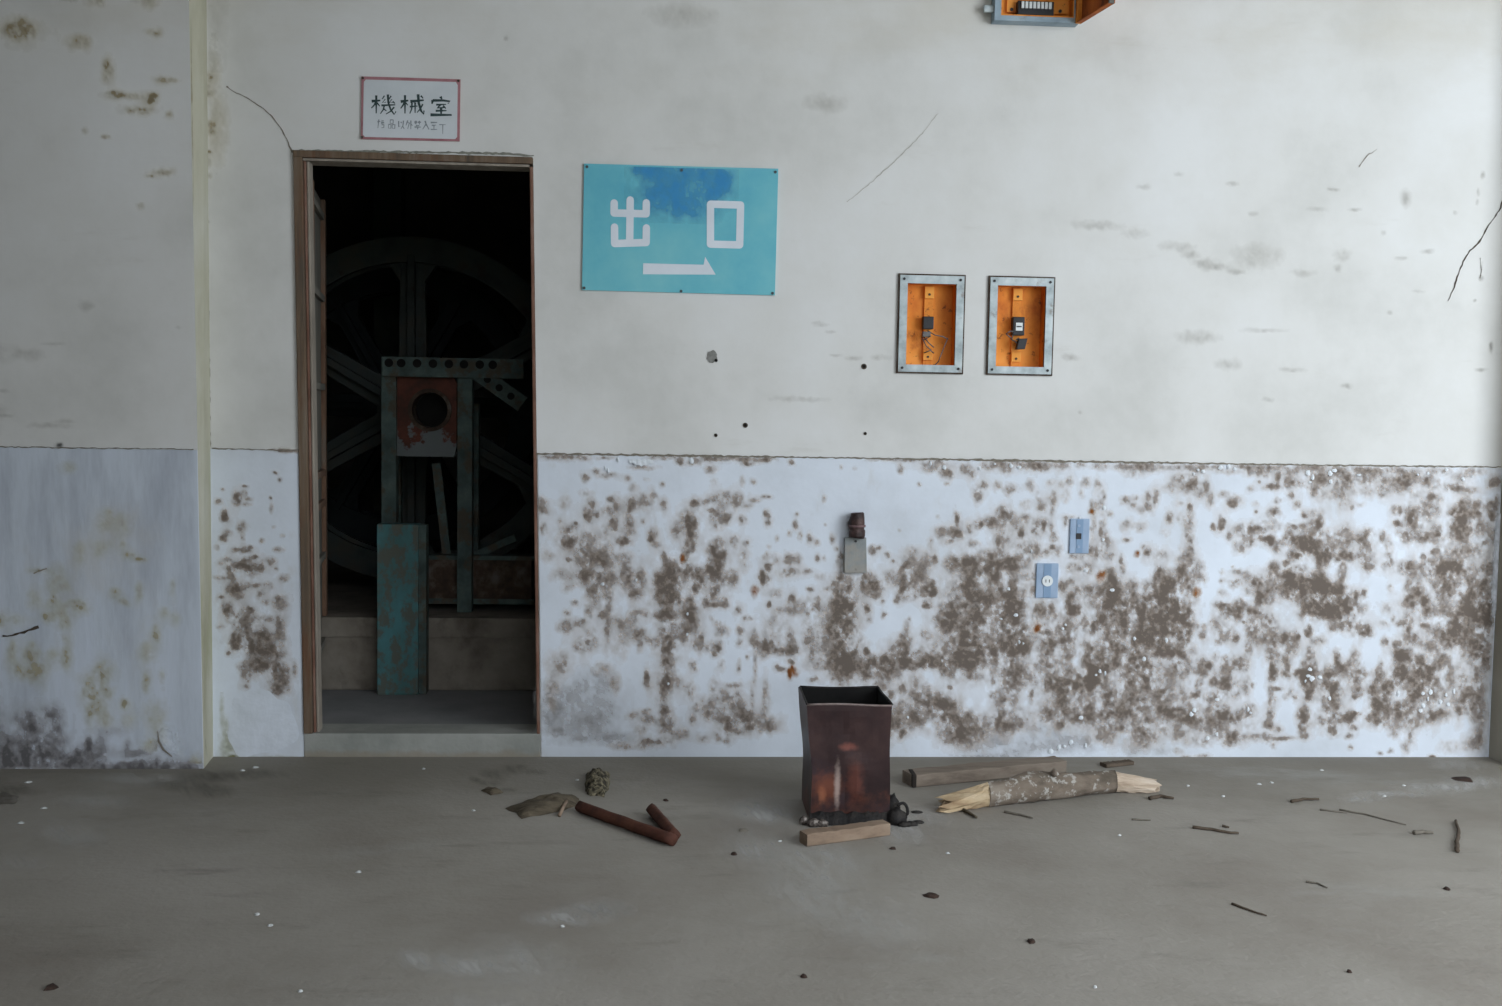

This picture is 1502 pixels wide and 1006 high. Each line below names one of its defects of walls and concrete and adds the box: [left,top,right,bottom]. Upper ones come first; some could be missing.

leakage [111,78,165,111]
crack [1448,202,1502,301]
leakage [816,554,870,685]
leakage [0,708,199,769]
leakage [544,679,618,741]